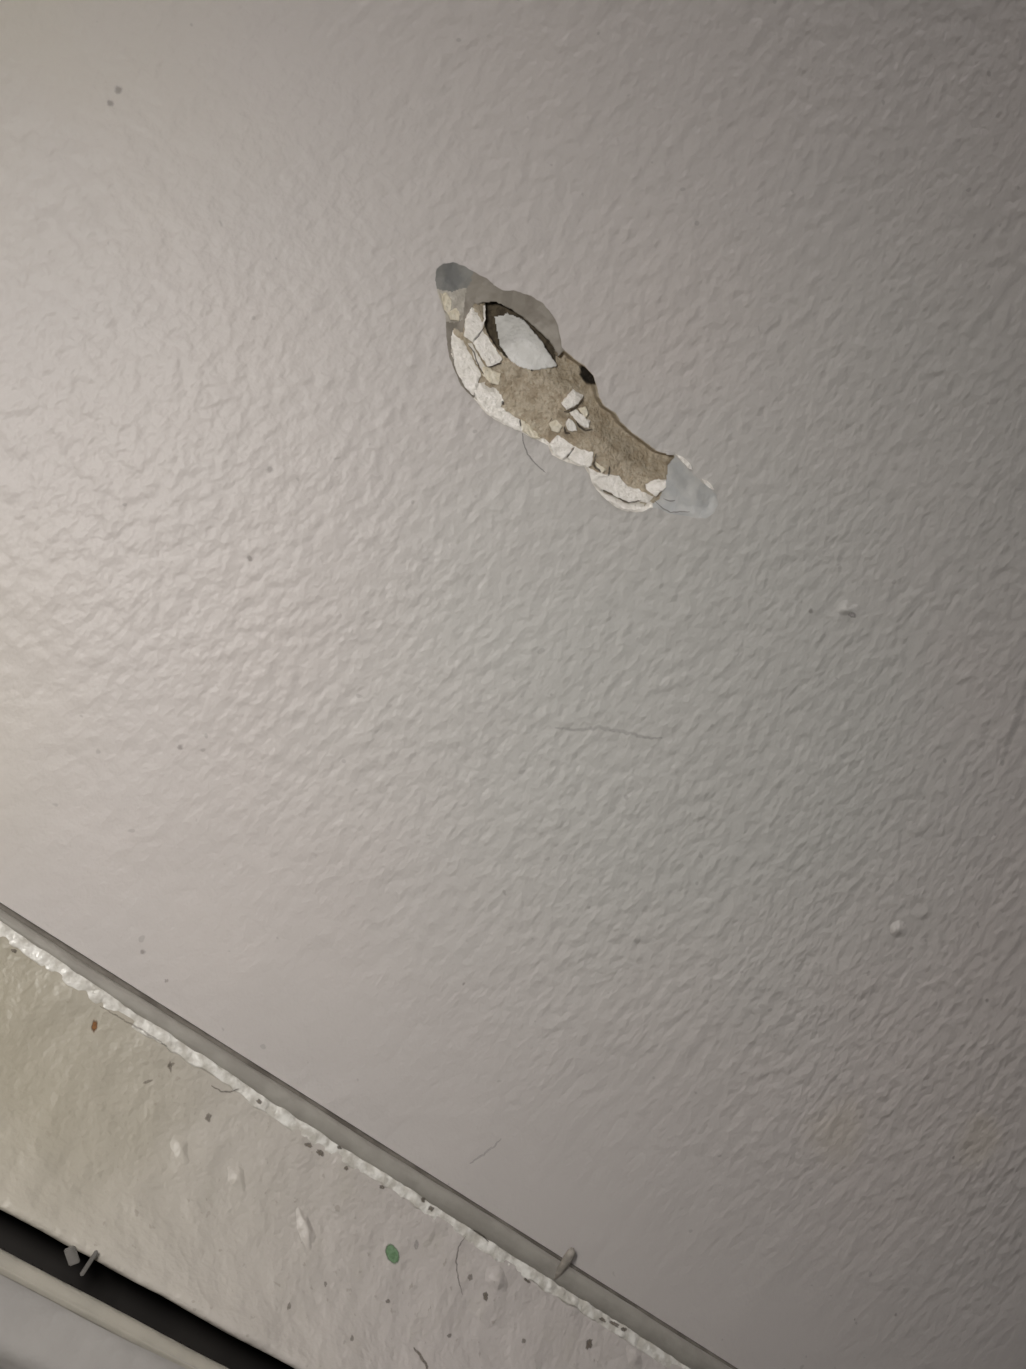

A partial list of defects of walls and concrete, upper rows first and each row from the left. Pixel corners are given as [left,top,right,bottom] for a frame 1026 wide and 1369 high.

flaking render [435,262,718,519]